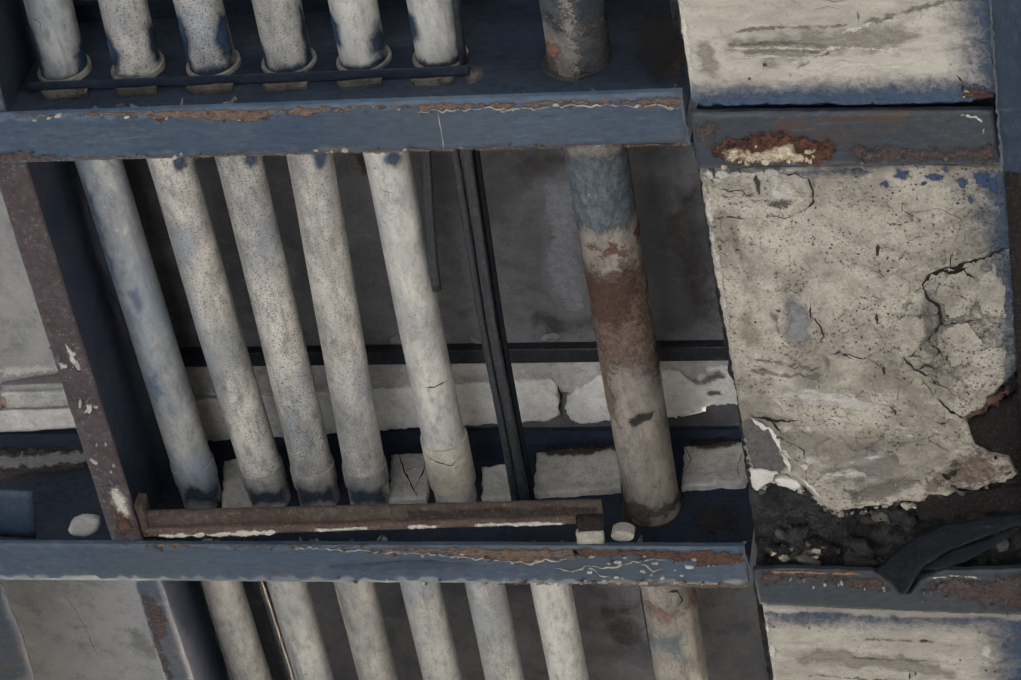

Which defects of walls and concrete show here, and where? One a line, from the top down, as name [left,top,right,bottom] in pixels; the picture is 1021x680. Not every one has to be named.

rust [7,97,684,126]
spalling [703,168,785,201]
rust [711,130,996,170]
rust [577,221,660,428]
crack [809,183,1021,454]
spalling [871,261,1019,419]
crack [399,455,425,498]
crack [754,416,810,491]
spalling [734,381,968,569]
rust [288,545,745,569]
spalling [948,511,1021,567]
rust [485,579,748,657]